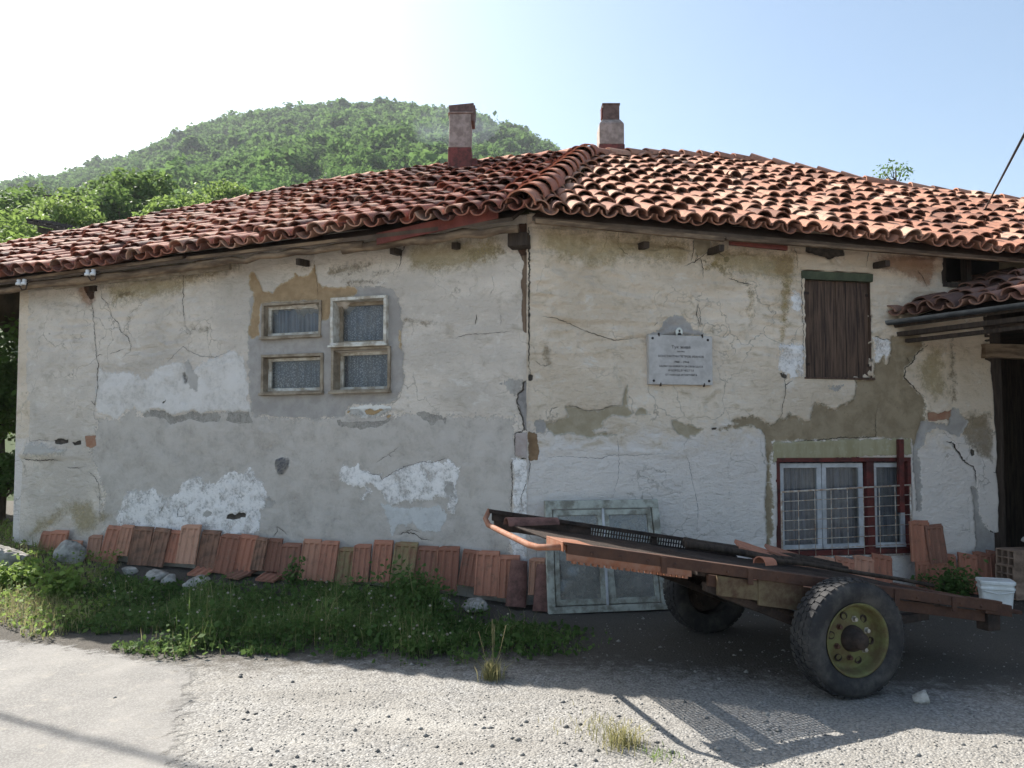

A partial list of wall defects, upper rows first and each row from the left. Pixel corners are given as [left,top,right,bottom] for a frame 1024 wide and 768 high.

crack [91,288,131,420]
flaking render [248,266,357,339]
peeling [55,374,655,579]
crack [459,227,698,526]
flaking render [671,335,951,545]
crack [946,441,997,477]
flaking render [971,486,995,553]